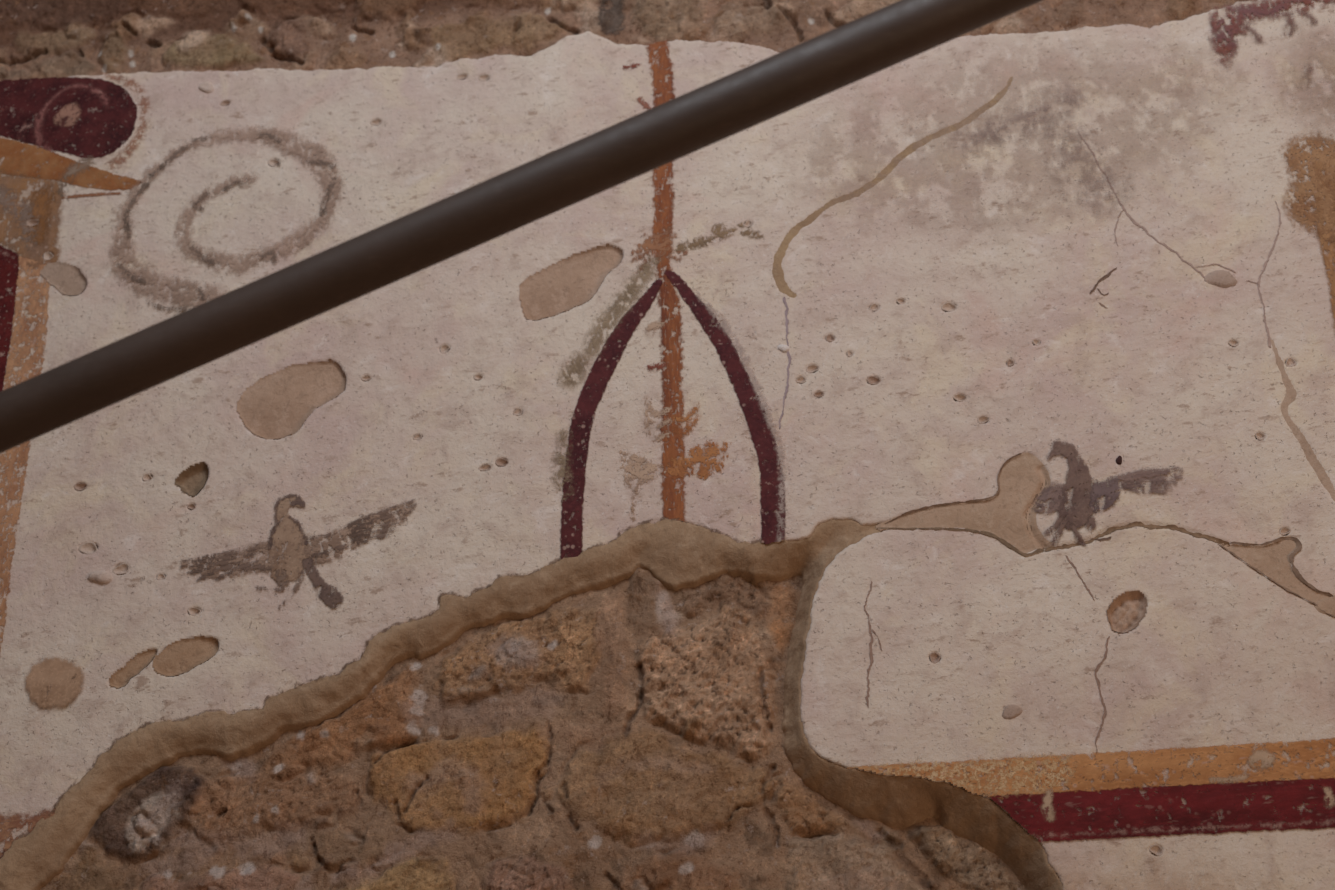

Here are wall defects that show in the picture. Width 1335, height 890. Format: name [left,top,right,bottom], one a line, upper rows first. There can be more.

flaking render [519,243,623,321]
crack [772,76,1013,428]
crack [1078,133,1335,501]
flaking render [236,359,372,440]
spalling [175,462,209,510]
spalling [40,567,1026,890]
crack [864,581,882,707]
crack [1095,636,1110,753]
spalling [1107,590,1147,633]
crack [1044,521,1335,617]